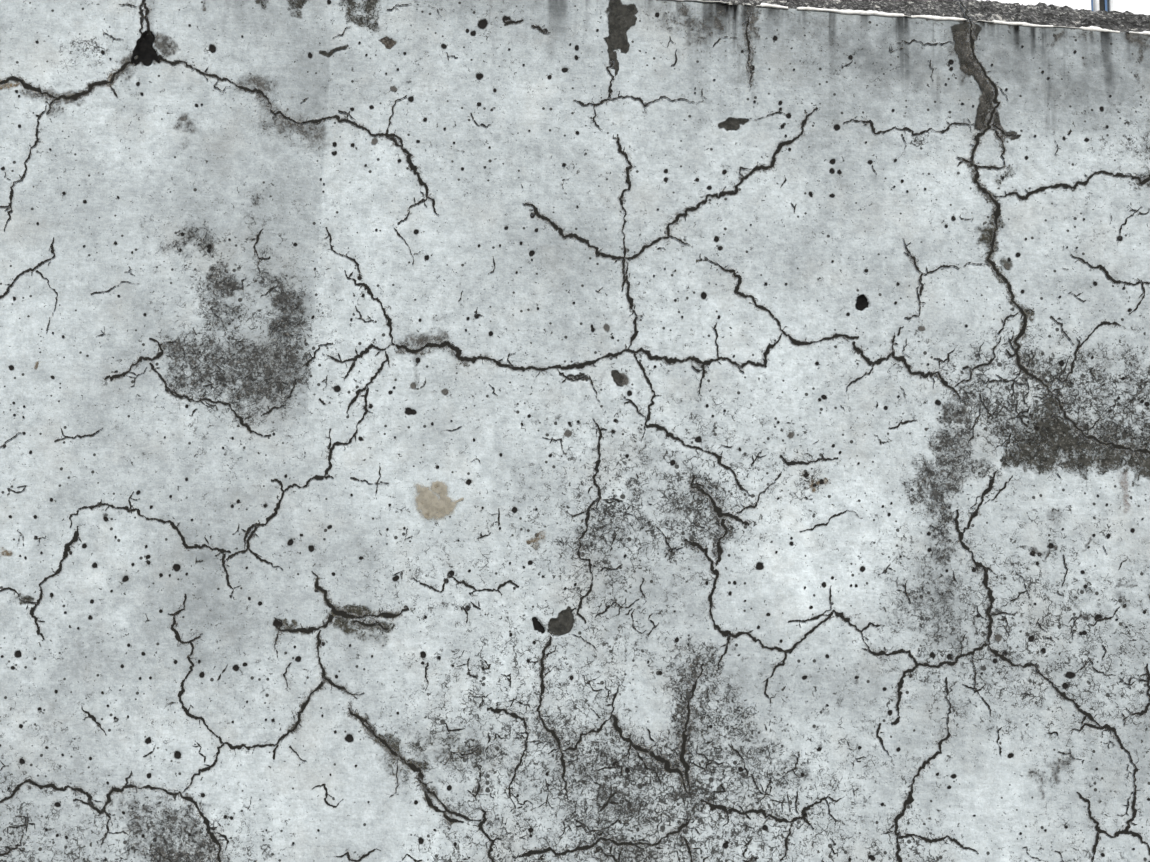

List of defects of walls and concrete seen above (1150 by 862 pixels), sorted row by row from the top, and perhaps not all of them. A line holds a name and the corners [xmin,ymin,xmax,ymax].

damp [287,0,308,18]
damp [338,0,379,31]
damp [604,0,765,85]
damp [944,22,1021,142]
damp [1125,33,1150,77]
mould [160,222,310,423]
damp [896,304,1150,644]
crack [0,571,859,862]
crack [657,470,1150,862]
damp [119,794,230,862]